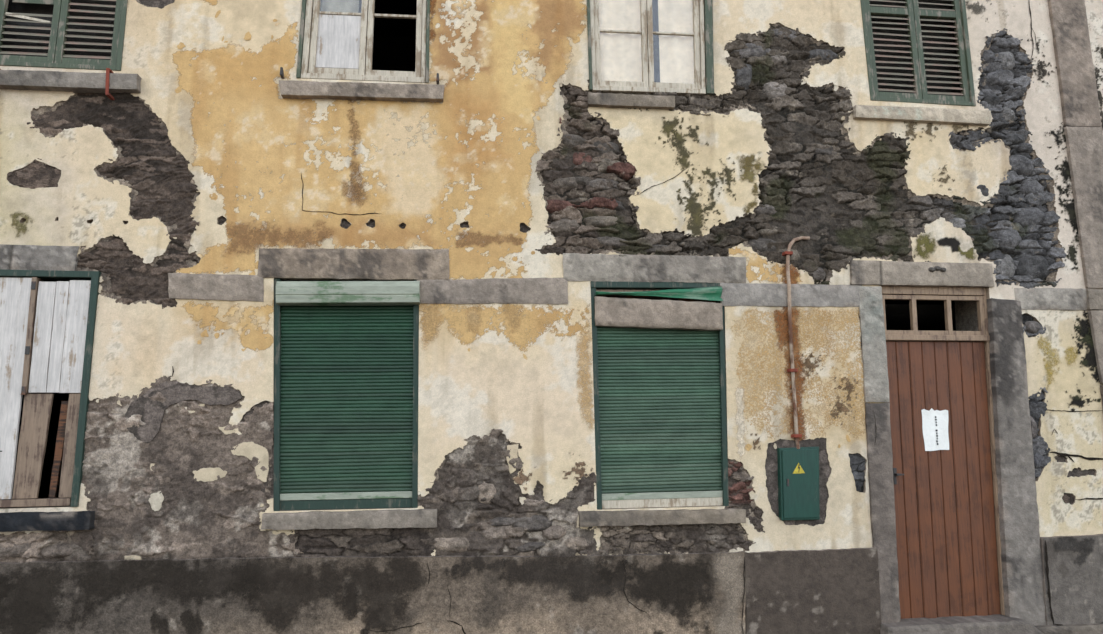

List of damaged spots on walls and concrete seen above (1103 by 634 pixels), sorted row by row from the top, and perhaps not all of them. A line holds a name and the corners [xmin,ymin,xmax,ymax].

flaking render [7,158,61,189]
peeling [27,0,1067,360]
corrosion [782,264,800,284]
flaking render [0,375,773,563]
corrosion [774,306,806,441]
peeling [731,306,875,492]
flaking render [1028,387,1095,480]
water stain [0,552,427,634]
crack [363,564,466,634]